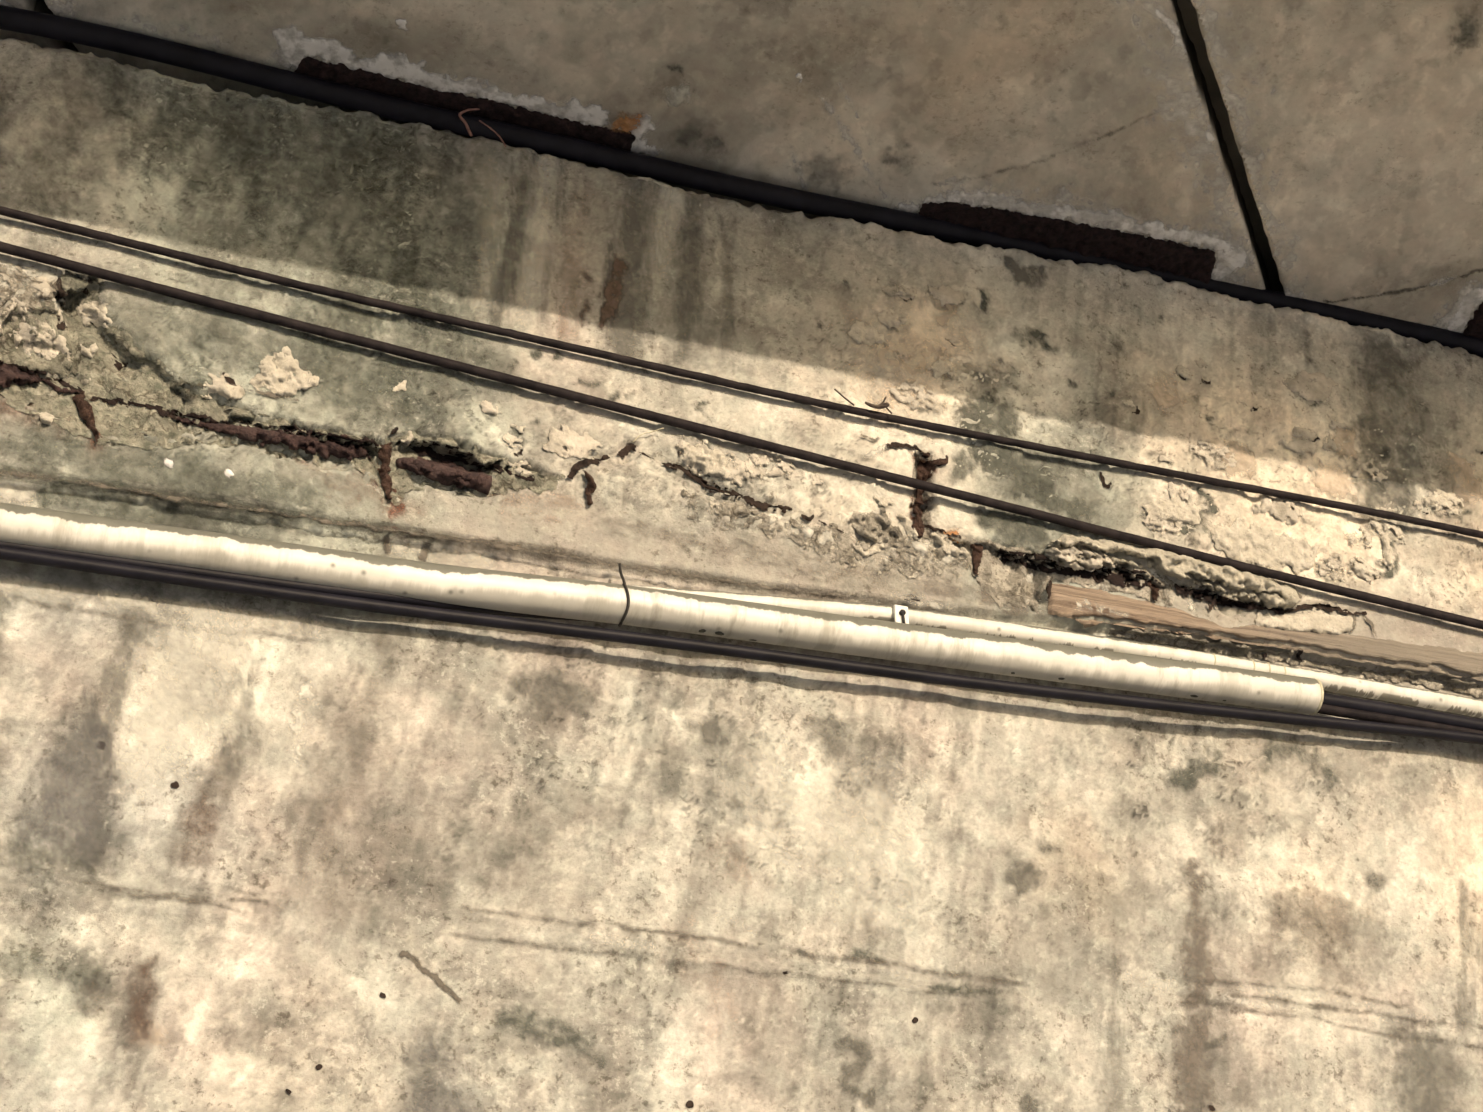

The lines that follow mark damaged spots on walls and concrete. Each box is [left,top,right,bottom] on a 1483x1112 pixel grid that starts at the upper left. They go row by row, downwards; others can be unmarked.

leakage [273,27,662,156]
leakage [897,0,1254,287]
leakage [580,179,670,358]
corrosion [0,361,90,400]
spalling [0,264,603,506]
corrosion [177,416,492,495]
crack [567,443,844,533]
spalling [677,432,1284,615]
leakage [952,371,1090,549]
crack [1284,587,1376,636]
leakage [1170,751,1220,790]
leakage [1165,861,1227,1112]